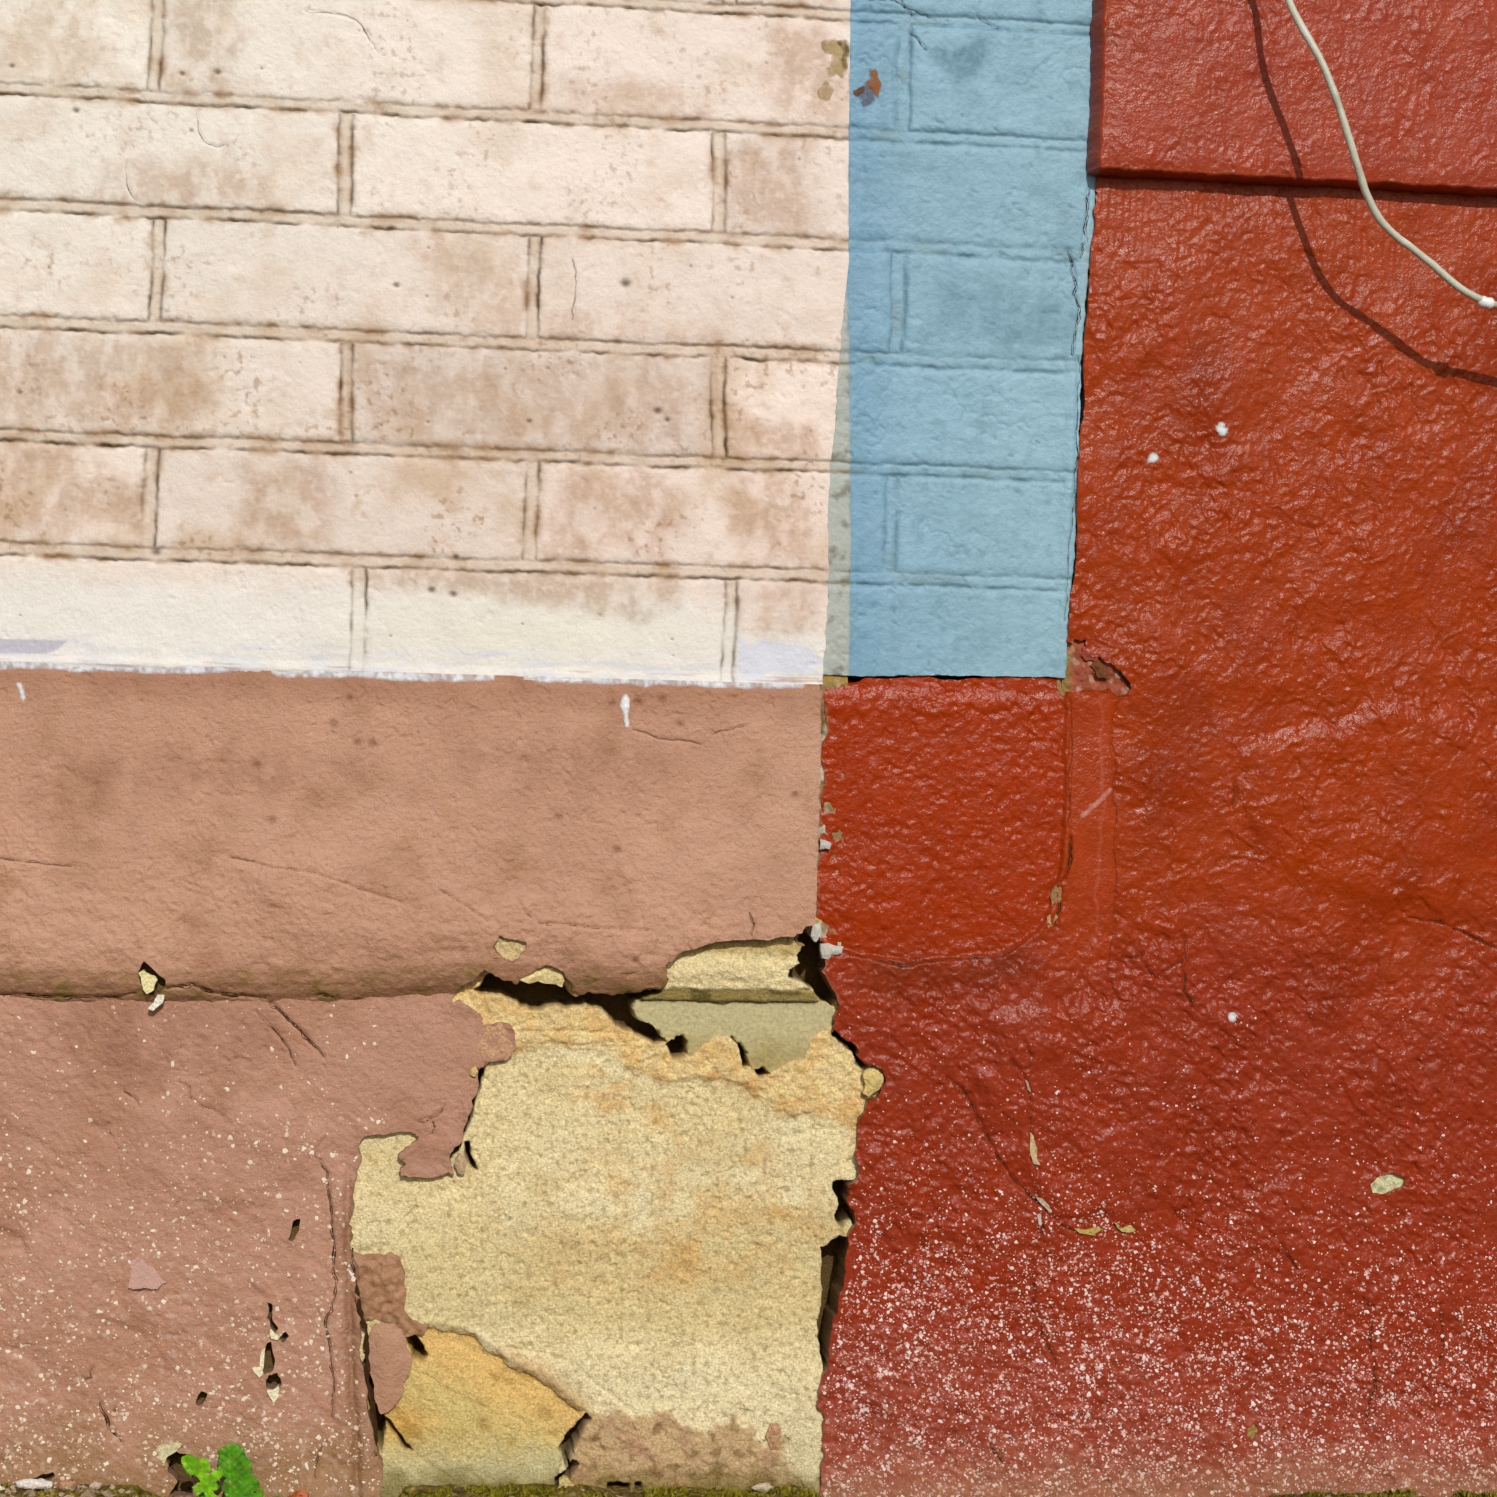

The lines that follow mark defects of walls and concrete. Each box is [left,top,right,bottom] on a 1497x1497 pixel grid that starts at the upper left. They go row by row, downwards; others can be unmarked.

peeling [817,40,881,106]
spalling [1055,640,1130,696]
peeling [138,962,166,1011]
crack [843,944,1021,967]
spalling [349,917,884,1497]
peeling [252,1304,288,1406]